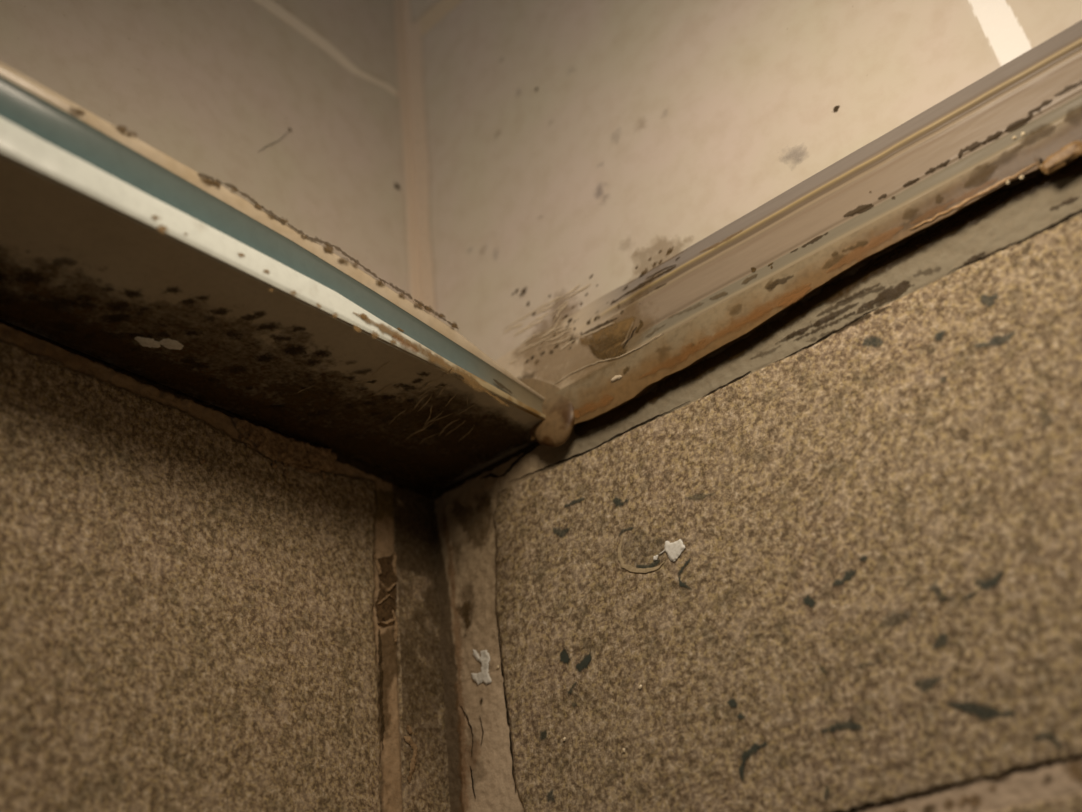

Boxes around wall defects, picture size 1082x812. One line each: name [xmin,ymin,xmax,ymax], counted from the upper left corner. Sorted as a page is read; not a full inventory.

leakage [903,81,1082,187]
peeling [909,140,1082,230]
leakage [198,173,458,329]
leakage [526,274,599,363]
rust [646,284,811,375]
leakage [575,155,1082,436]
leakage [0,251,541,518]